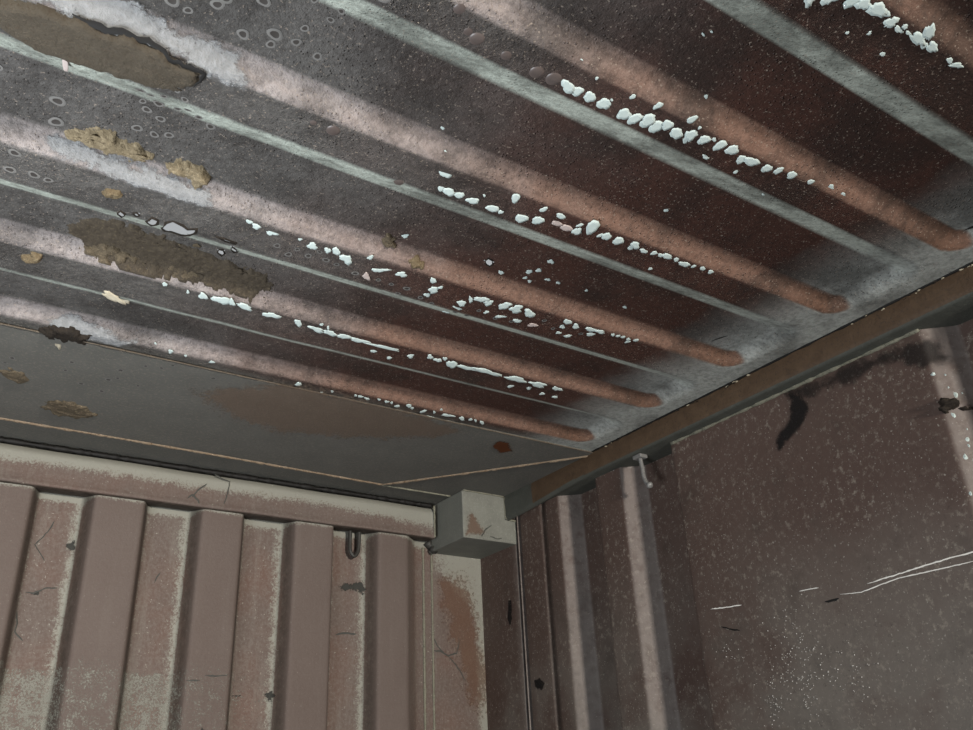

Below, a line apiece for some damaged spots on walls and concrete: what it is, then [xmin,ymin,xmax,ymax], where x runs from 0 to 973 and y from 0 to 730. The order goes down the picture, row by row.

peeling [38,0,248,89]
peeling [79,241,137,266]
peeling [186,290,281,319]
peeling [294,320,414,359]
peeling [427,354,563,398]
leakage [764,628,879,728]